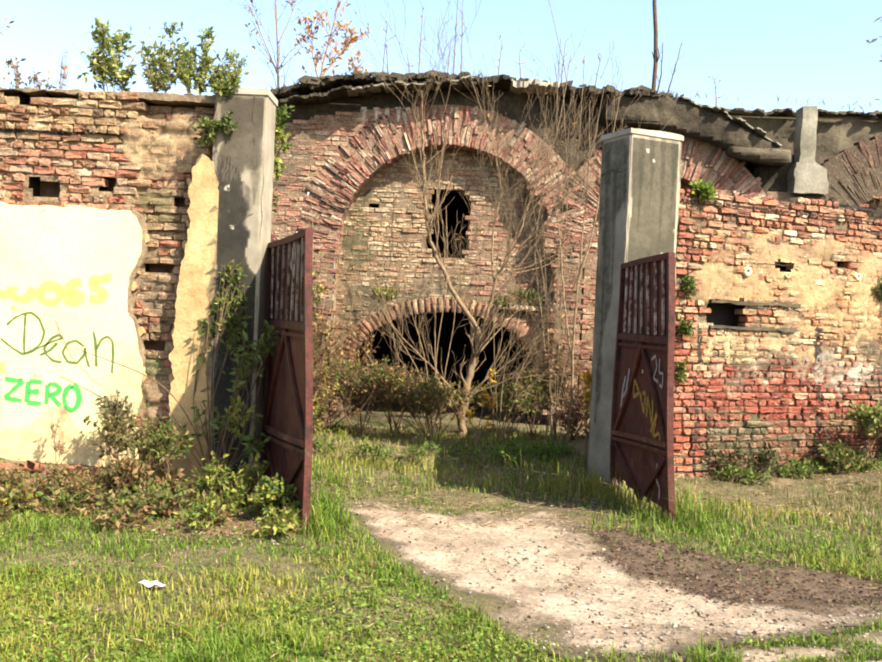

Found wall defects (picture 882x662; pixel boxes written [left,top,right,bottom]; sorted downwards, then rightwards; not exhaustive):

spalling [19,88,30,105]
spalling [30,177,40,197]
peeling [127,209,165,386]
peeling [169,153,230,487]
damp [200,156,259,490]
spalling [706,299,745,327]